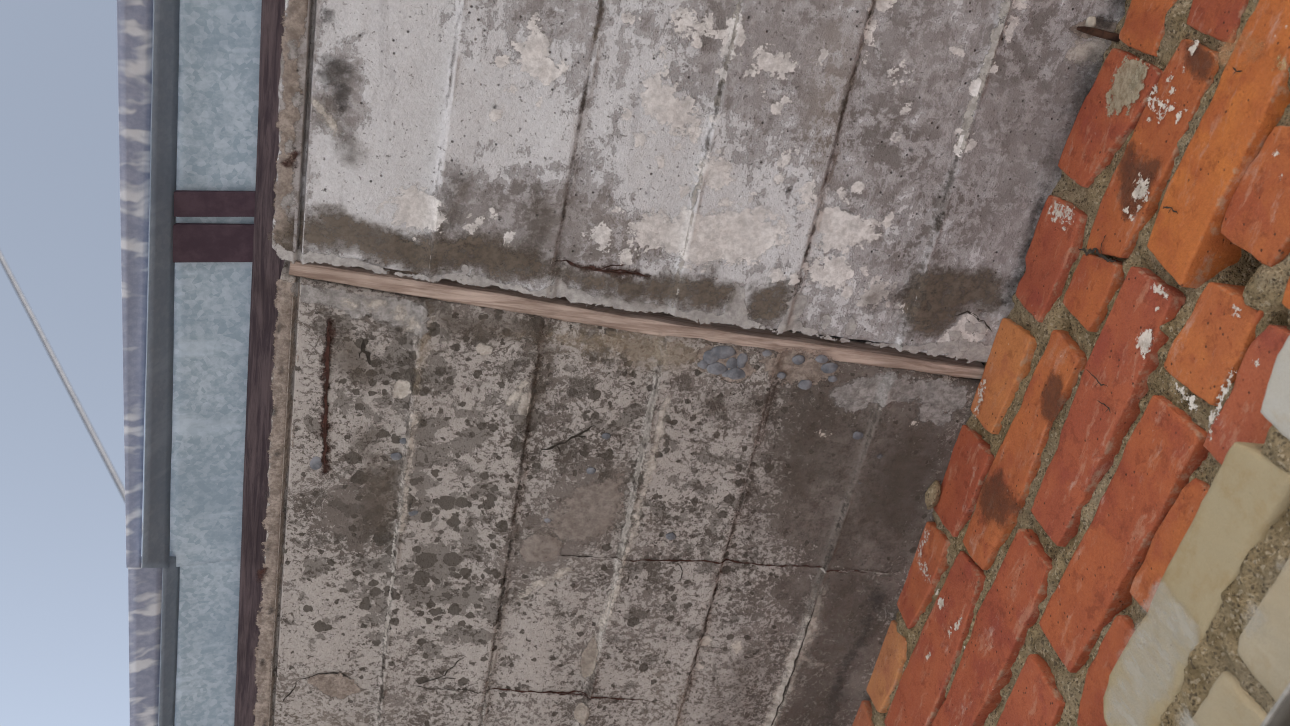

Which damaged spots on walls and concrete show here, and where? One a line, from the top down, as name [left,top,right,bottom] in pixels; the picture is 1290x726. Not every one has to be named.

water stain [313,100,351,160]
water stain [1119,145,1159,221]
water stain [276,202,735,310]
crack [553,260,651,277]
water stain [749,281,797,324]
water stain [898,197,1075,337]
rust [310,312,336,474]
crack [560,555,902,581]
water stain [917,528,944,610]
crack [418,656,652,702]
water stain [763,586,828,726]